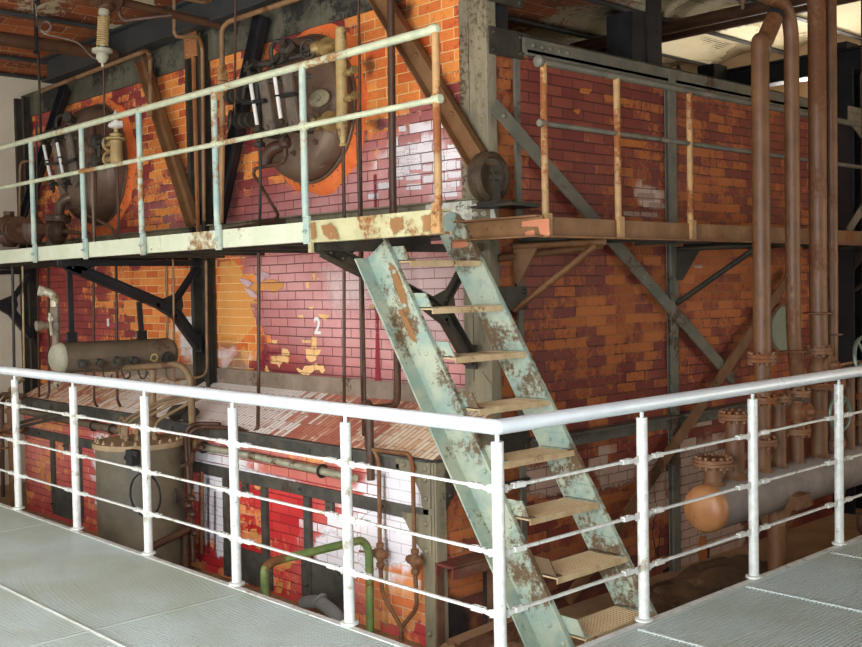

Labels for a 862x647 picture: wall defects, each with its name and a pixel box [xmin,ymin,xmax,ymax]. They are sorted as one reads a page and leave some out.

rust [310,222,338,240]
rust [390,217,403,234]
rust [421,213,431,232]
peeling [220,260,284,370]
rust [388,263,417,343]
peeling [265,337,325,375]